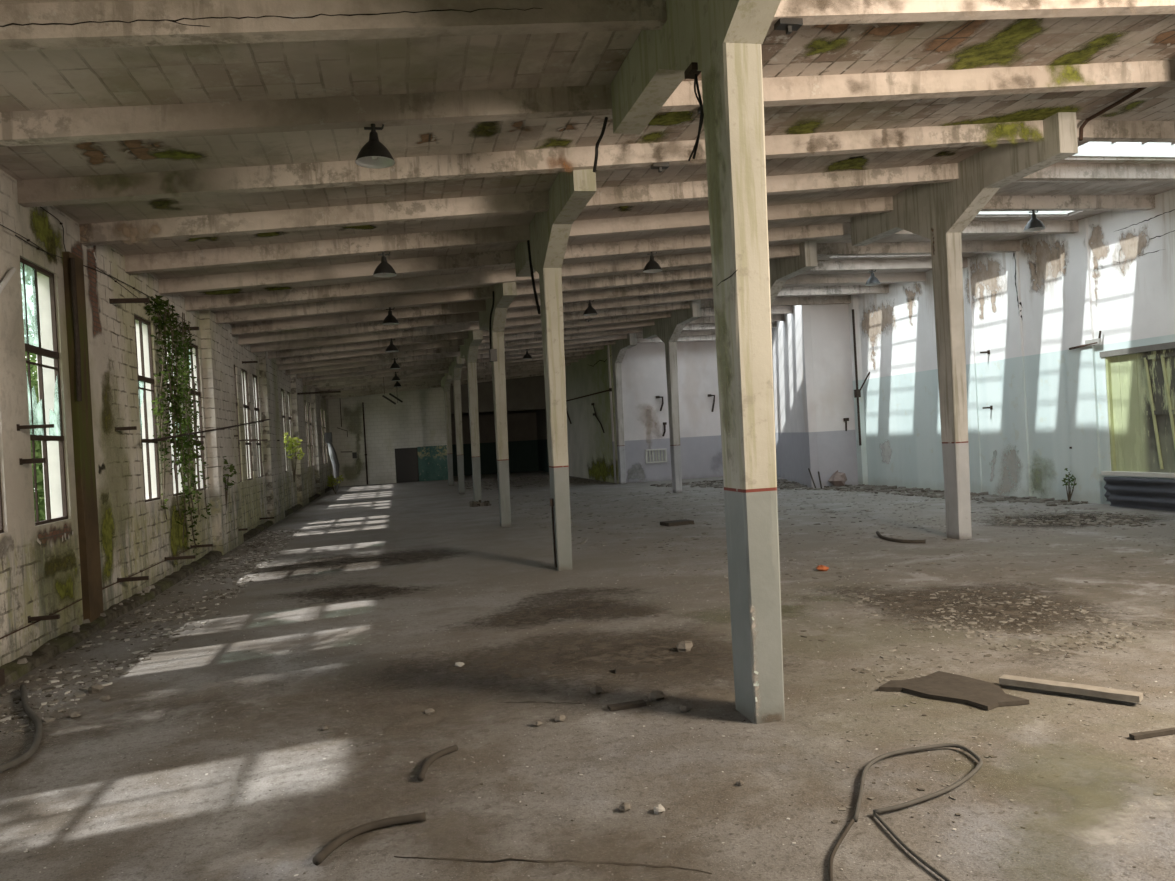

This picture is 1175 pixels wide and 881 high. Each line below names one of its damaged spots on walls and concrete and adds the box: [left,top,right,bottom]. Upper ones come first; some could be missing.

crack [0,8,543,27]
water stain [1050,65,1084,85]
water stain [985,122,1042,146]
spalling [76,140,164,165]